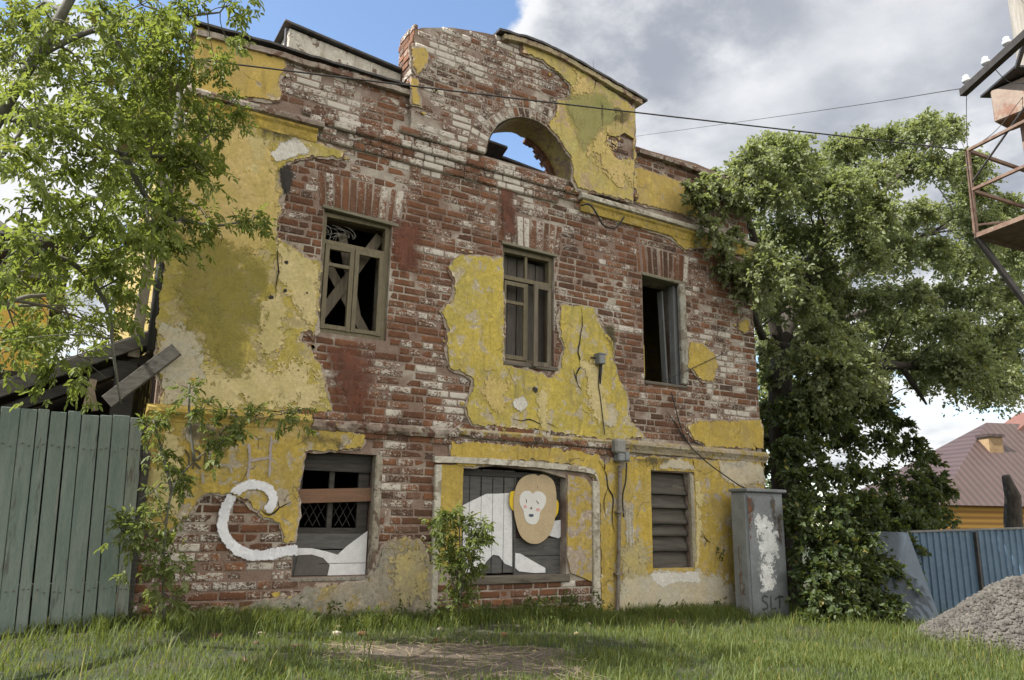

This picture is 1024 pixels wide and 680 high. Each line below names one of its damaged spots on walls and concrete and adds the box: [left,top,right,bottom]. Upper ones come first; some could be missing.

leakage [174,232,270,379]
spalling [155,24,759,614]
crack [573,308,583,390]
spalling [132,427,301,622]
peeling [719,461,767,512]
peeling [770,496,783,545]